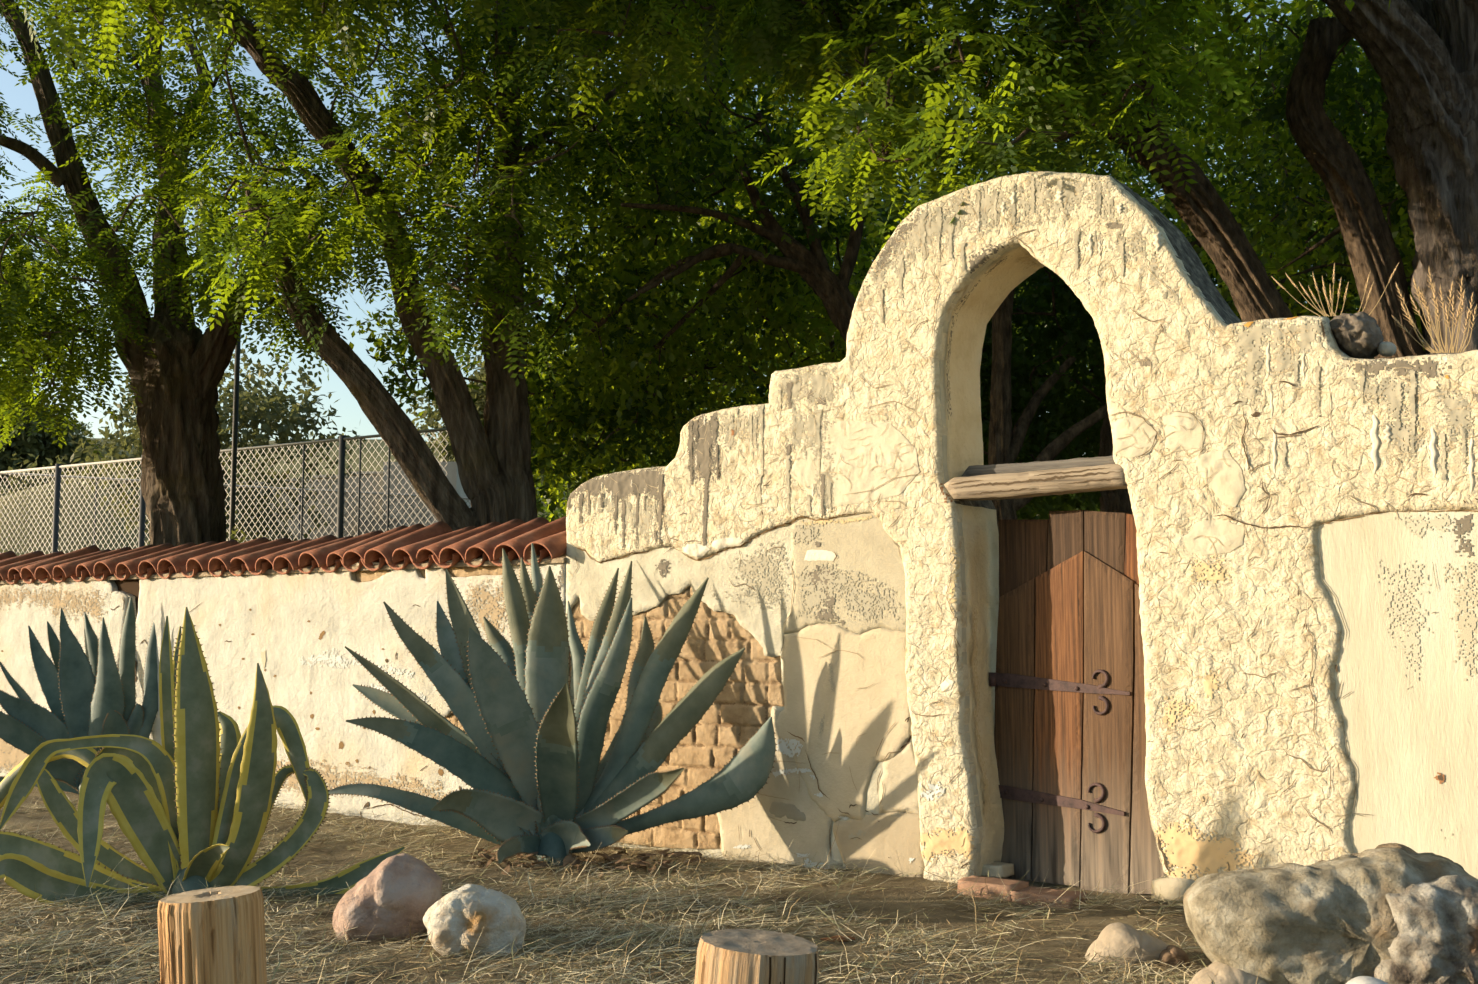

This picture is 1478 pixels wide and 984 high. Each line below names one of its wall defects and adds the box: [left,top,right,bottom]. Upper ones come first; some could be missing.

spalling [569,595,594,693]
water stain [566,467,670,578]
spalling [600,587,784,849]
water stain [687,365,903,629]
crack [1109,401,1478,874]